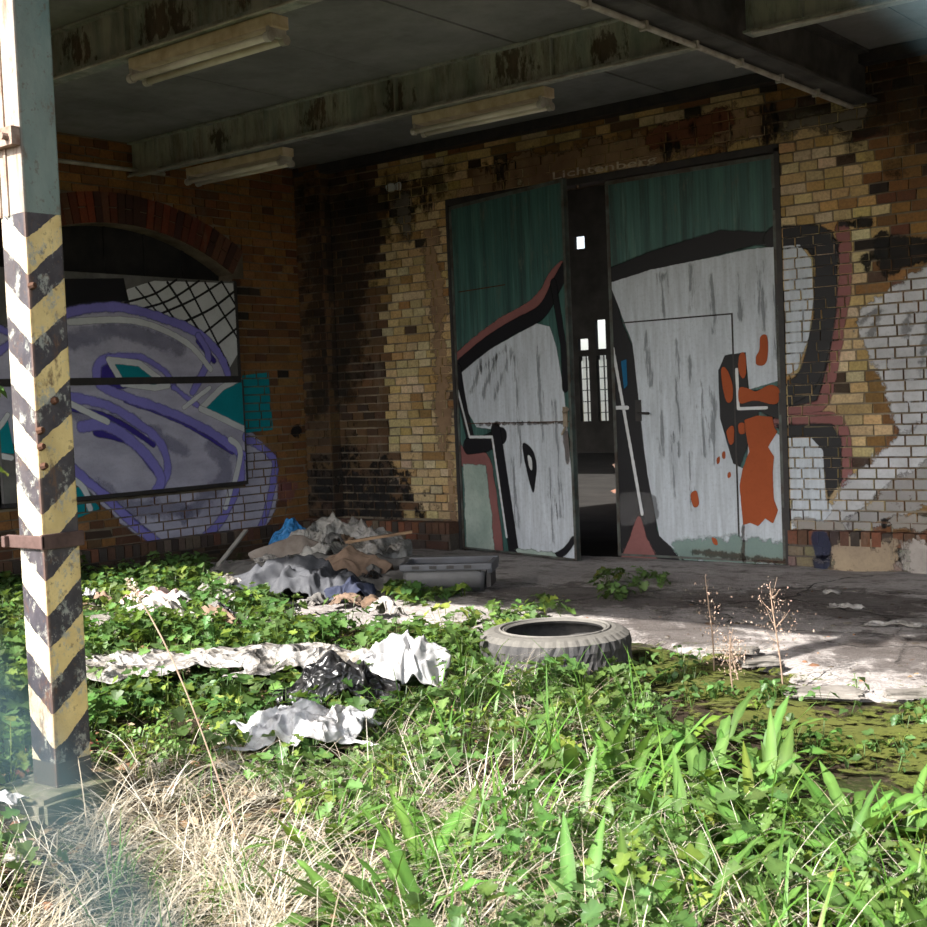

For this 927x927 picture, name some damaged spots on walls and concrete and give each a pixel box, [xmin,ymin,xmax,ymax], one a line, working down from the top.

corrosion [139,0,195,45]
corrosion [488,47,540,84]
corrosion [590,30,628,66]
flaking render [830,534,927,574]